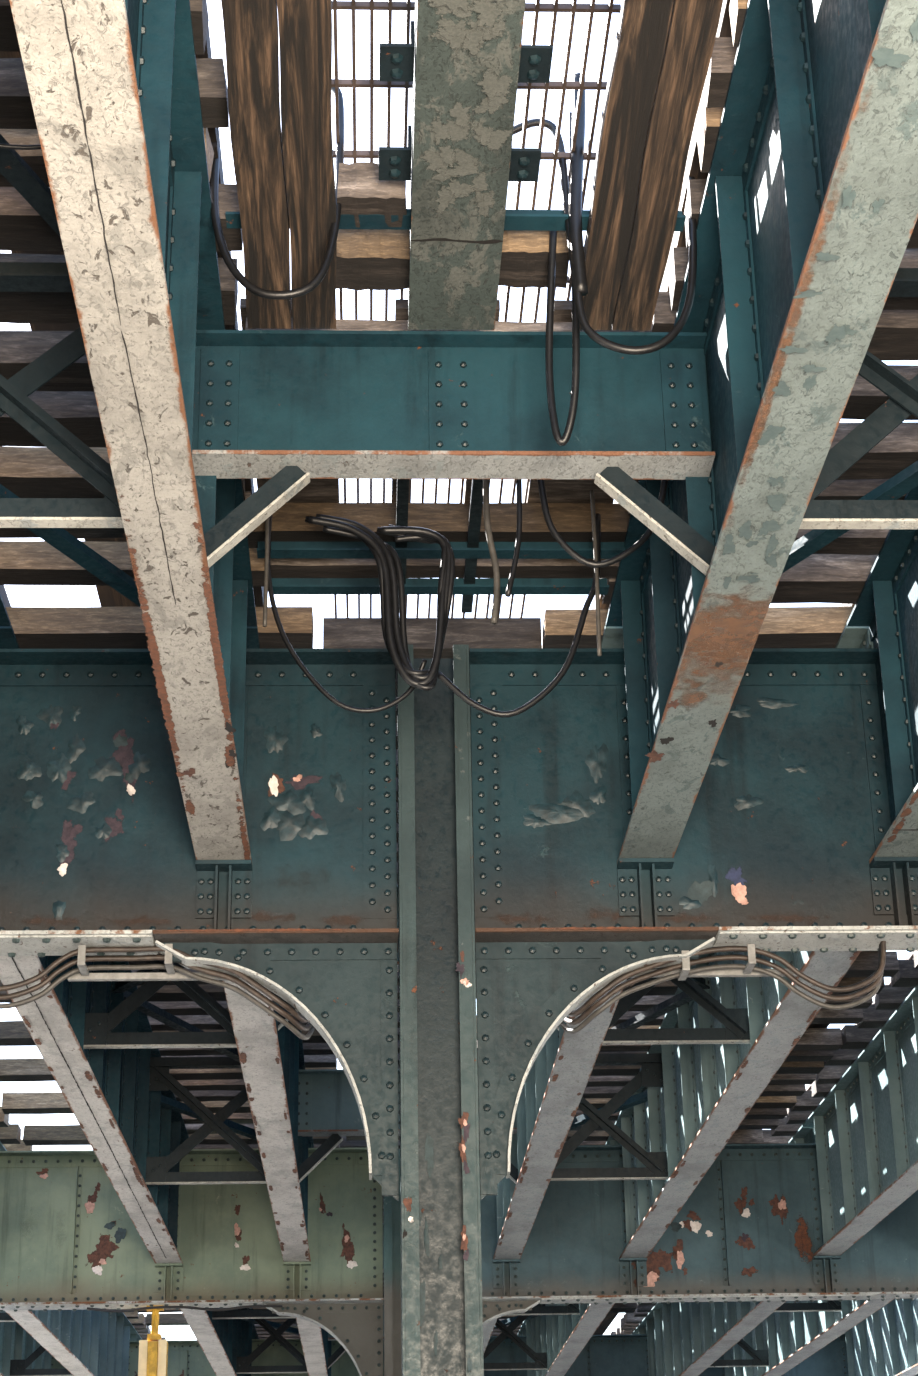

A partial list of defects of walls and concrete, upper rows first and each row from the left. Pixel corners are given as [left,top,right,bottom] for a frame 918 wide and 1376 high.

rust [675,595,769,706]
peeling [263,726,289,753]
peeling [55,729,150,876]
peeling [260,772,347,841]
peeling [678,864,749,910]
peeling [85,1182,101,1214]
peeling [86,1234,119,1275]
peeling [234,1205,251,1271]
peeling [319,1192,358,1269]
peeling [631,1211,713,1287]
peeling [734,1186,788,1277]